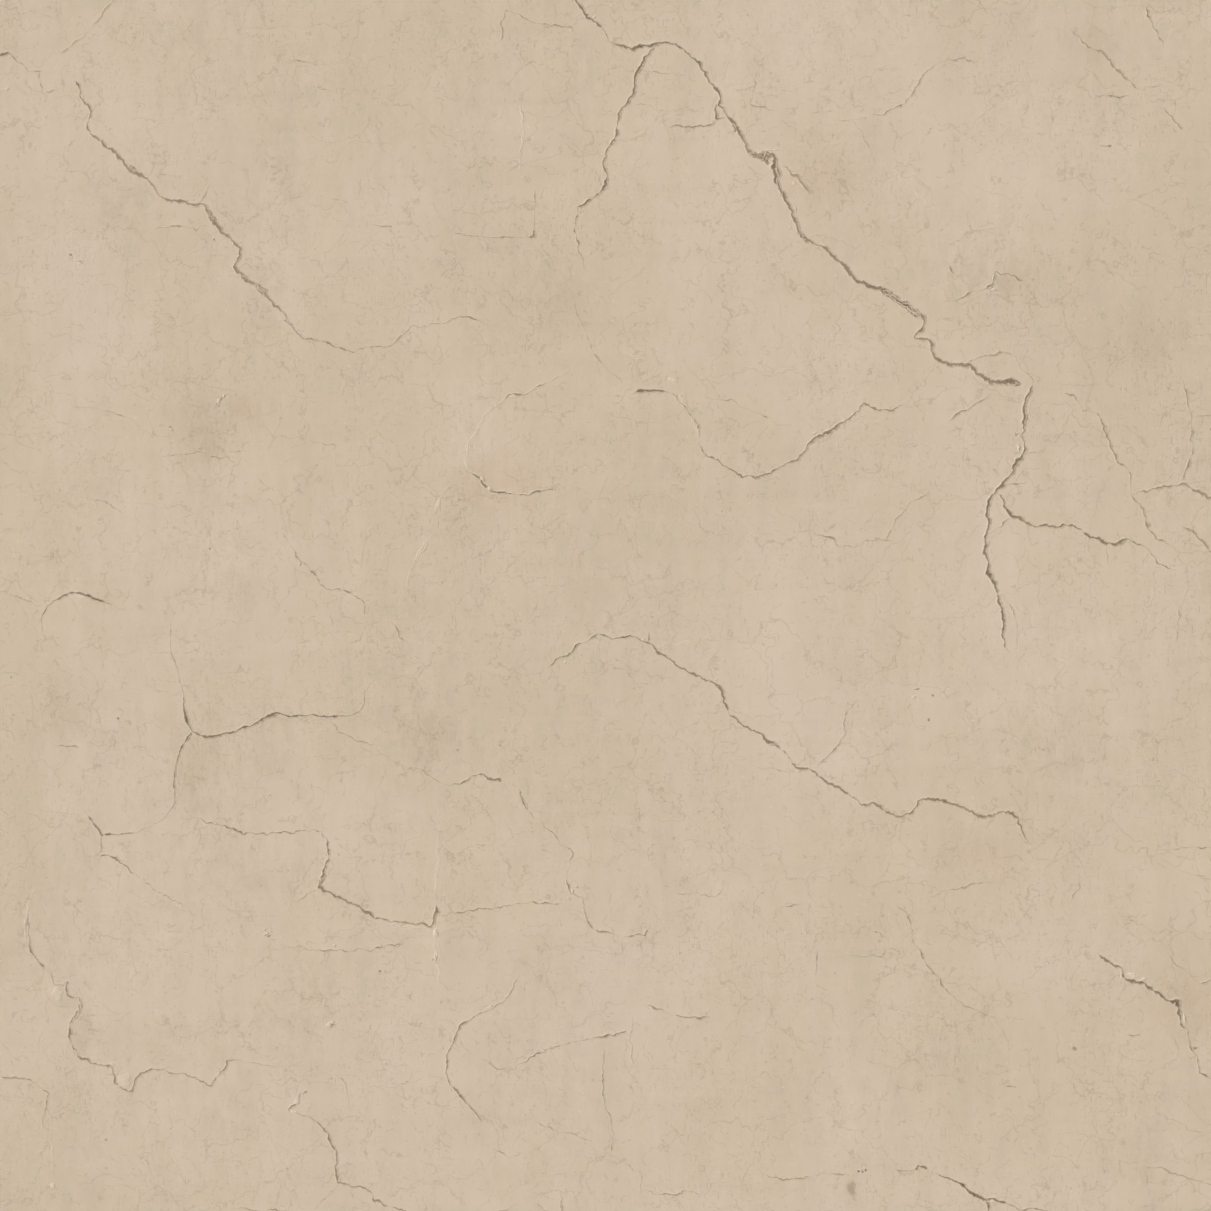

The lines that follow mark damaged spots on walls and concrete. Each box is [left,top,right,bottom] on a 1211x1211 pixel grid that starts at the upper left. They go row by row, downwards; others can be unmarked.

crack [0,0,489,354]
crack [455,0,1211,652]
crack [46,625,650,985]
crack [548,632,1050,860]
crack [24,886,522,1211]
crack [481,1004,710,1151]
crack [1098,952,1211,1080]